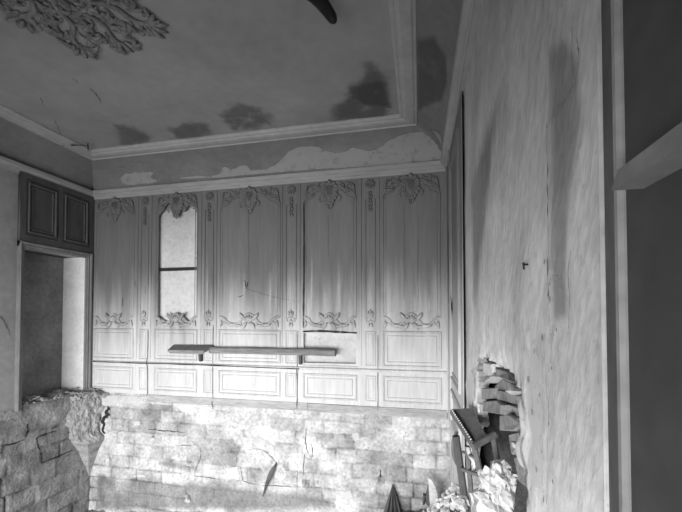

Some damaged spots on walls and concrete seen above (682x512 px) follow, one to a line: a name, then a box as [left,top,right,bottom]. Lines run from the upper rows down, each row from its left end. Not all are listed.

peeling [179,132,442,179]
spalling [482,362,532,487]